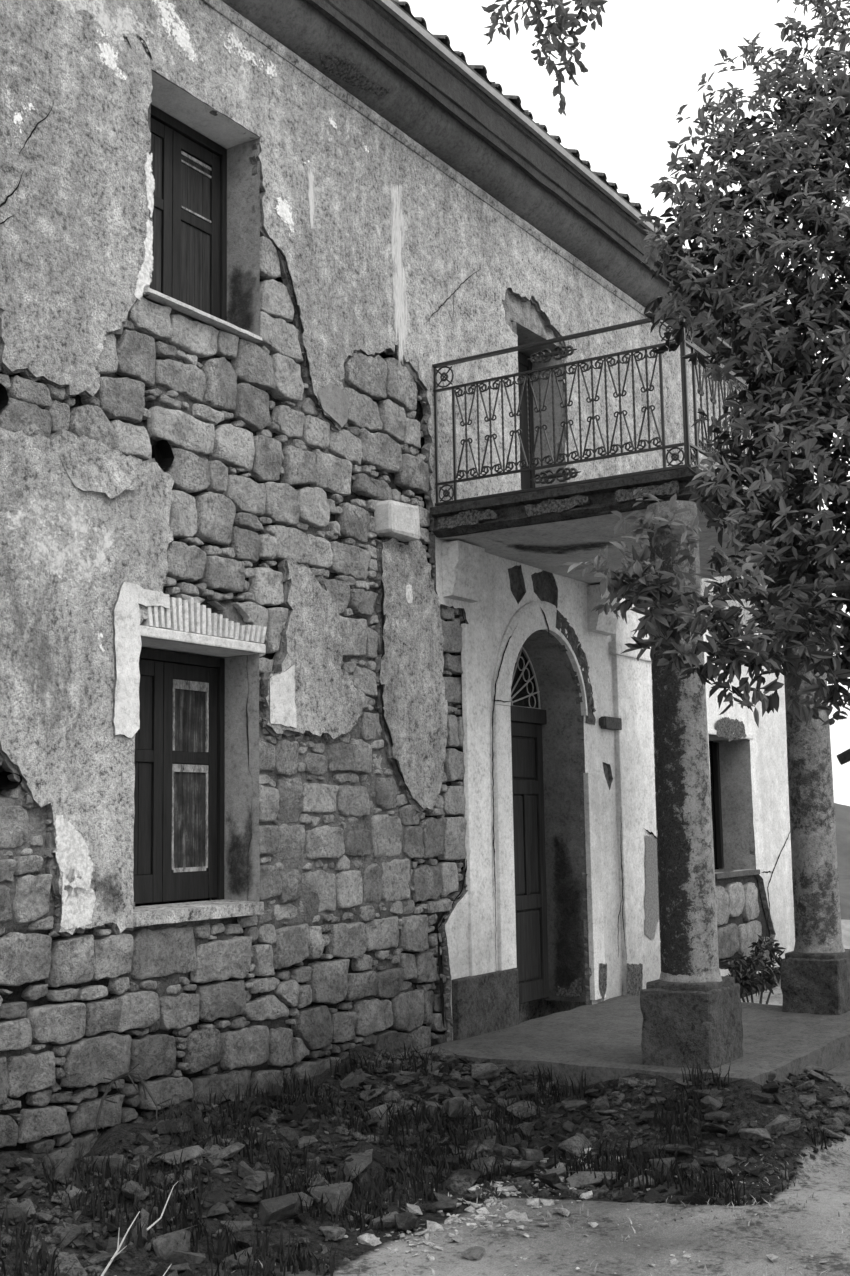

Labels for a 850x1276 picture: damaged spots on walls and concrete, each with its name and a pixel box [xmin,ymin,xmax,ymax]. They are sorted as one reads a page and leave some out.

crack [0,102,54,224]
damp [227,815,252,894]
flaking render [0,153,499,1160]
damp [647,520,716,977]